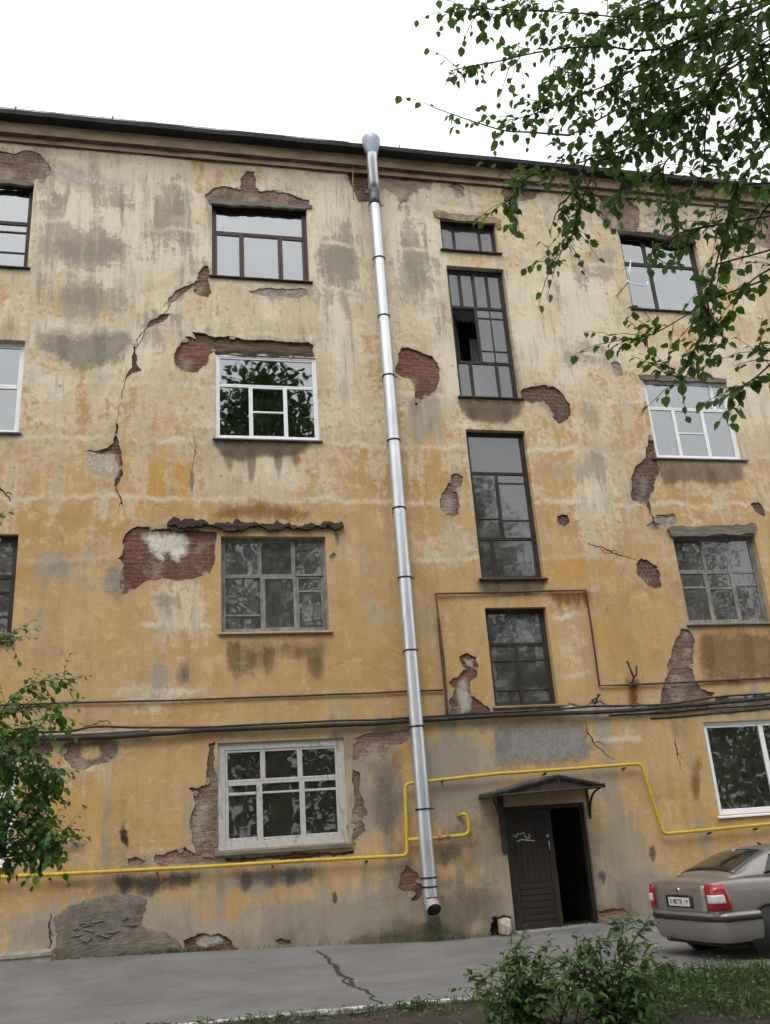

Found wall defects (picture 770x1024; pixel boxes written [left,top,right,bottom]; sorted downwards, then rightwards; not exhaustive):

flaking render [205,172,309,205]
crack [115,284,195,426]
flaking render [174,337,215,373]
flaking render [395,348,439,406]
flaking render [521,386,570,424]
flaking render [631,436,677,530]
flaking render [105,527,217,596]
flaking render [636,559,661,589]
flaking render [449,653,490,720]
peeling [495,629,770,766]
crack [583,723,615,760]
flaking render [128,729,409,866]